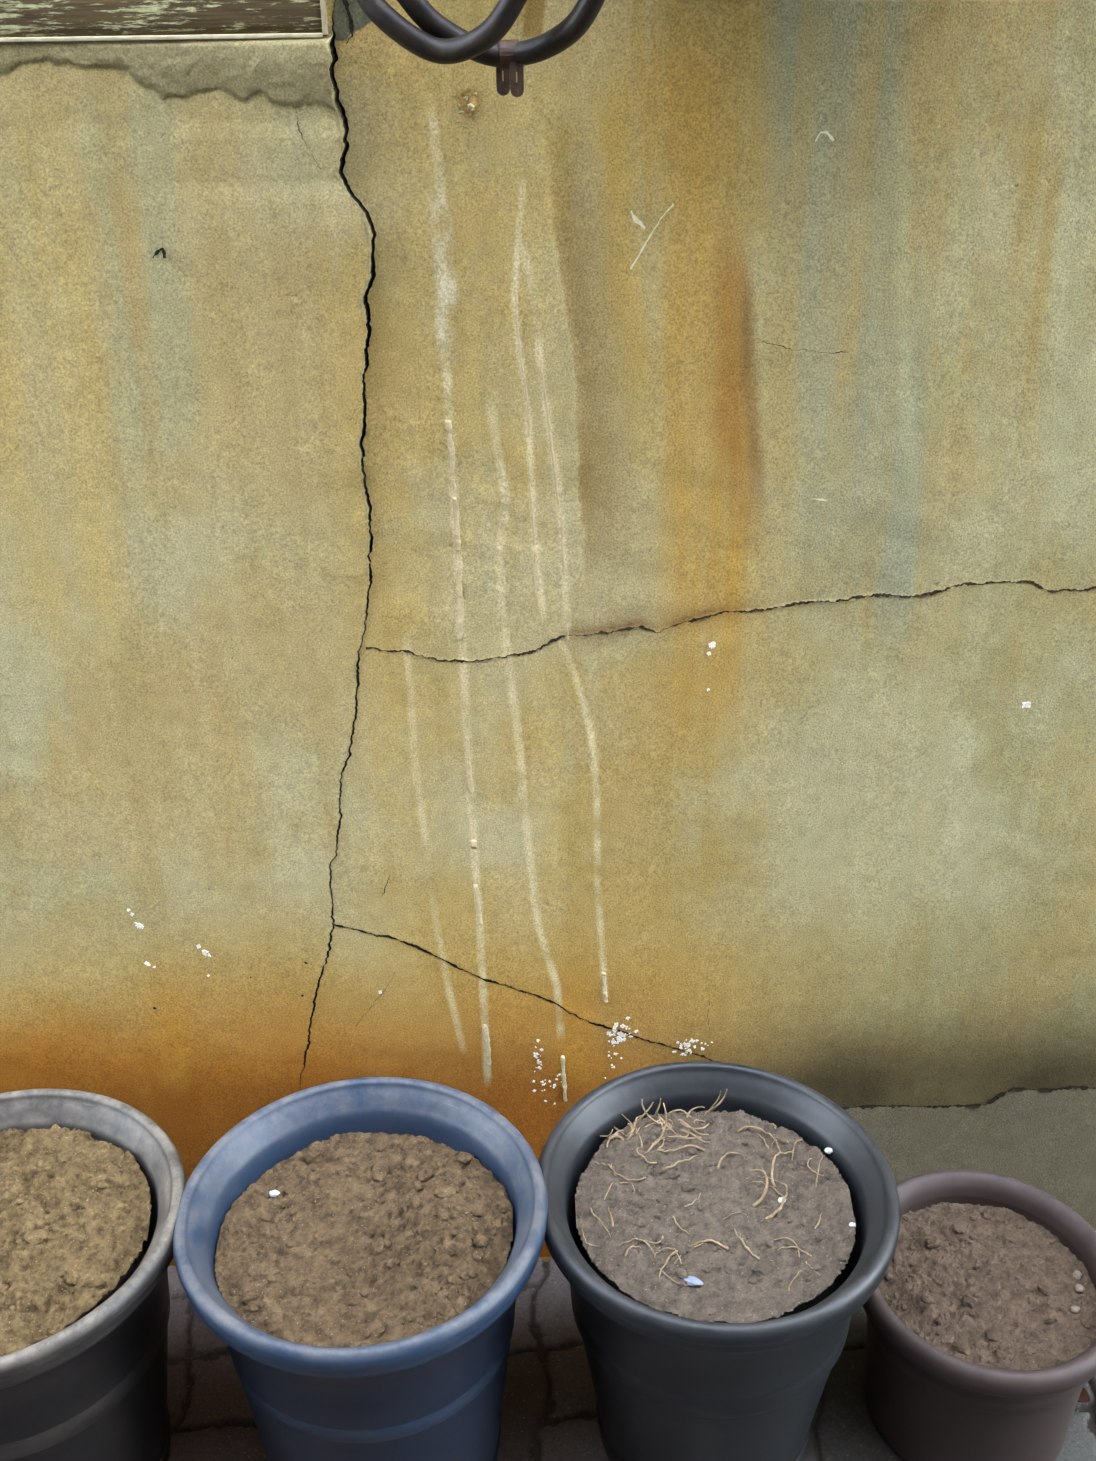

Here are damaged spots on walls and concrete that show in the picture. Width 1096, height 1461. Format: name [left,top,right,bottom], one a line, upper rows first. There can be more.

leakage [400,102,494,1088]
leakage [482,110,650,1102]
rust [558,0,796,776]
crack [296,0,1096,1091]
rust [0,942,820,1181]
rust [539,1240,552,1257]
leakage [594,987,1096,1230]